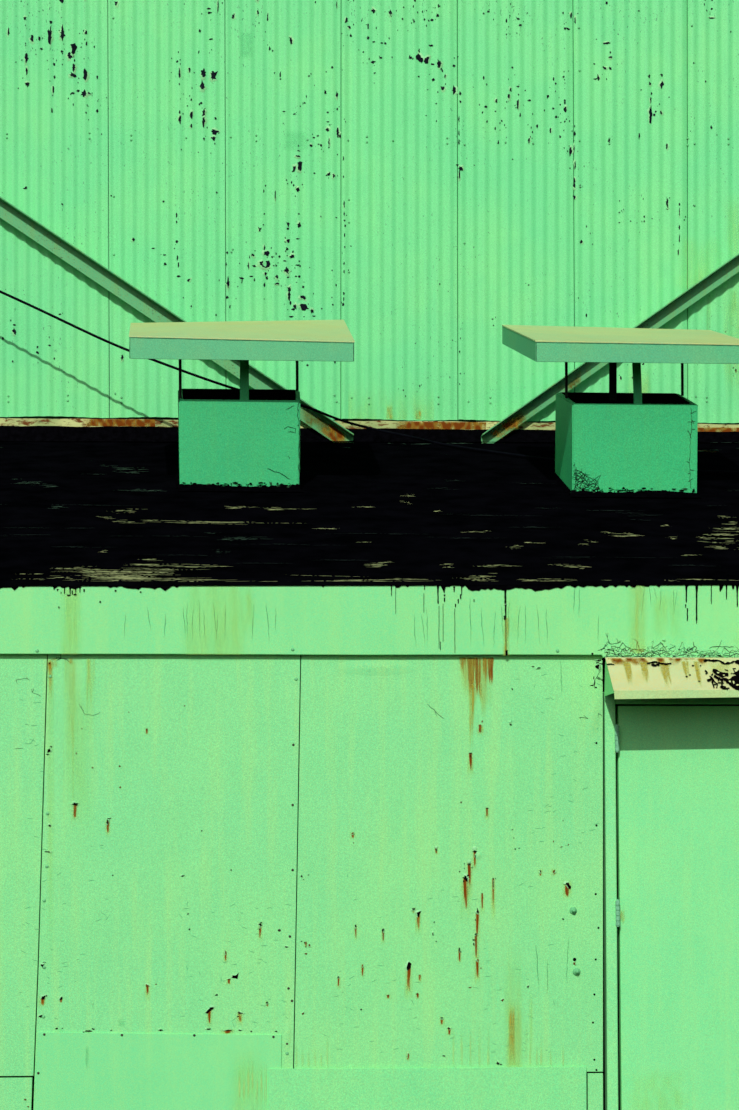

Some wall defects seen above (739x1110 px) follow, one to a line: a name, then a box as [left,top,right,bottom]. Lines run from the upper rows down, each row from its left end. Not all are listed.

peeling [18,11,107,120]
peeling [169,51,220,154]
peeling [409,45,488,104]
peeling [479,67,585,200]
peeling [639,74,664,138]
peeling [219,75,349,318]
rust [306,412,344,441]
rust [401,411,525,436]
water stain [334,560,547,632]
water stain [643,555,739,623]
rust [460,657,494,714]
peeling [590,639,739,693]